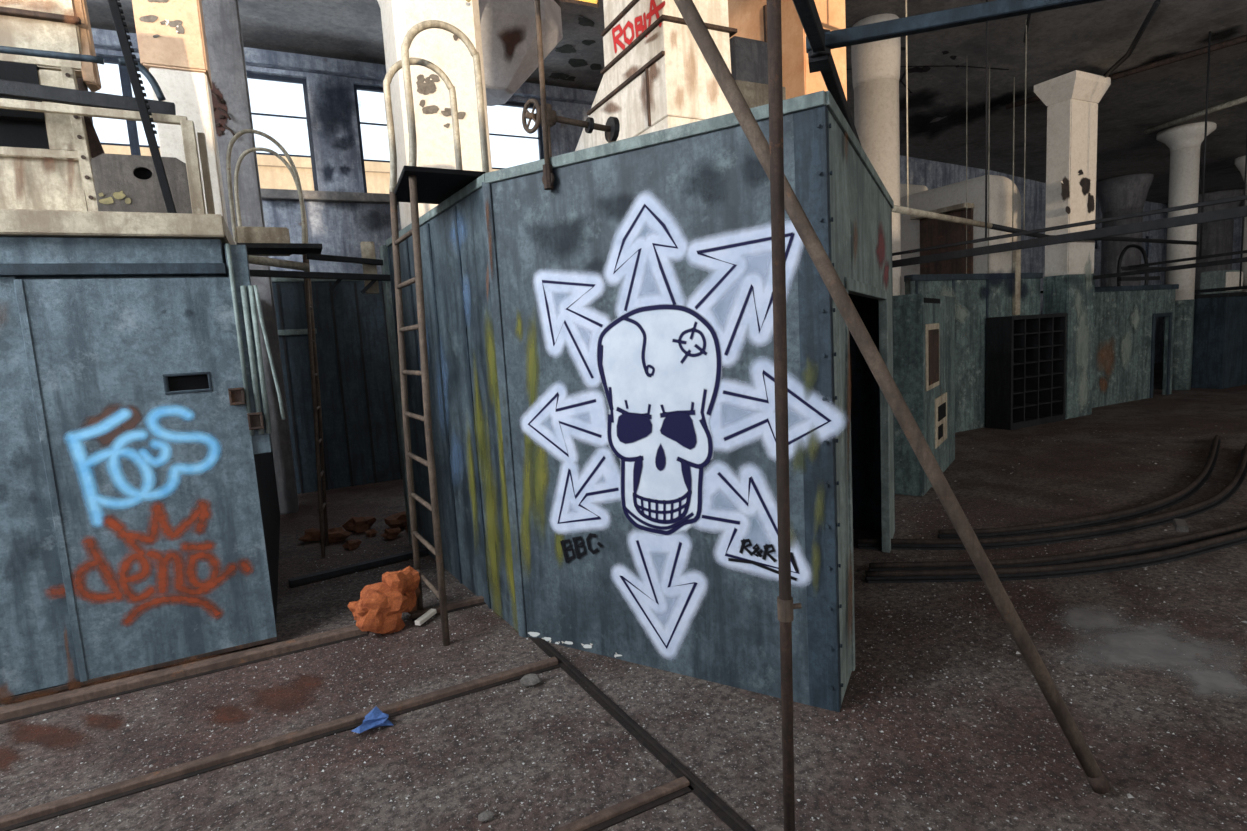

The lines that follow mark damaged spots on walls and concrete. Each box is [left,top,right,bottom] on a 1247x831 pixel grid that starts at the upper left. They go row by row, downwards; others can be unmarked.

peeling [139,0,184,38]
peeling [416,74,466,128]
peeling [1061,168,1095,214]
water stain [468,316,547,612]
water stain [555,532,563,562]